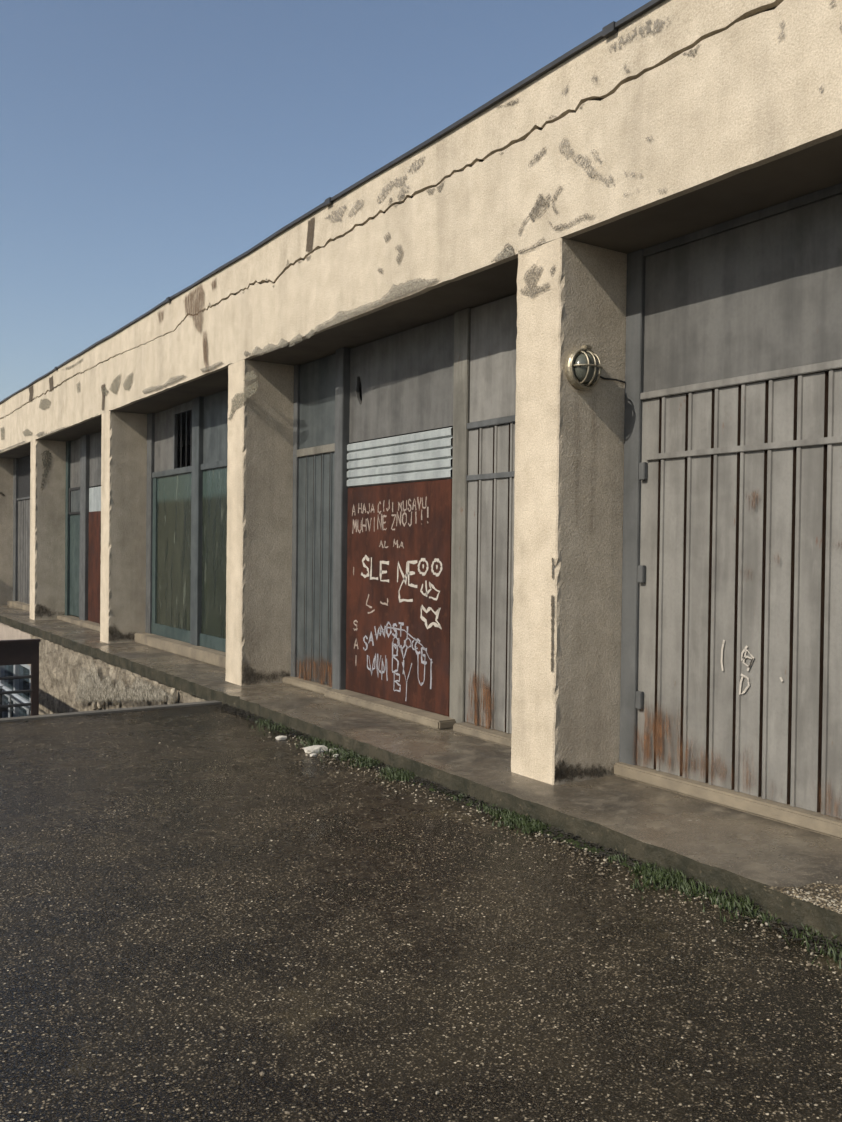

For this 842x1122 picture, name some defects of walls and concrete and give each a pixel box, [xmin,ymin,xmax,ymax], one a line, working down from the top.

peeling [377,157,425,203]
crack [359,98,605,226]
peeling [528,137,643,195]
peeling [326,200,363,222]
peeling [519,186,593,234]
spalling [491,238,544,262]
peeling [520,264,555,297]
spalling [244,278,437,356]
crack [99,384,107,410]